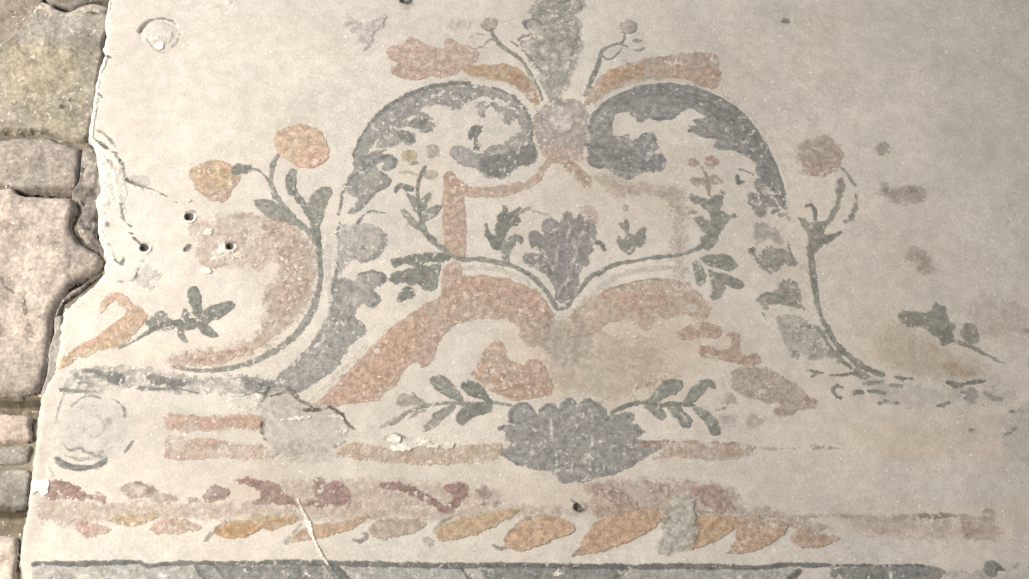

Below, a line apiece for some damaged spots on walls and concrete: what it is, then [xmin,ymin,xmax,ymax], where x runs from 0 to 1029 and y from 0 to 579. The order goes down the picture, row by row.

crack [230,386,354,440]